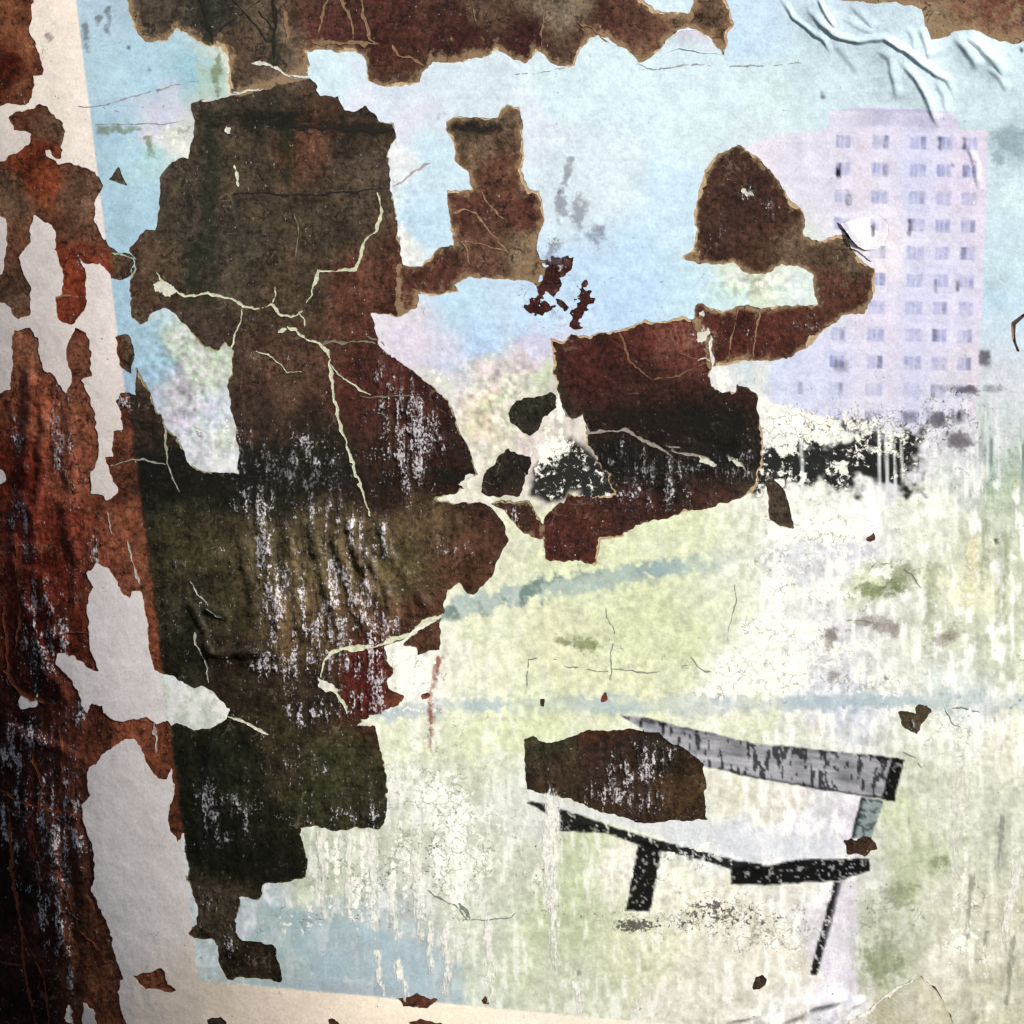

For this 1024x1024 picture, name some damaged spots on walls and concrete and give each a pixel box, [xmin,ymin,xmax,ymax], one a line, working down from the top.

crack [111,163,430,516]
crack [287,124,395,134]
peeling [0,0,734,1024]
peeling [481,145,875,566]